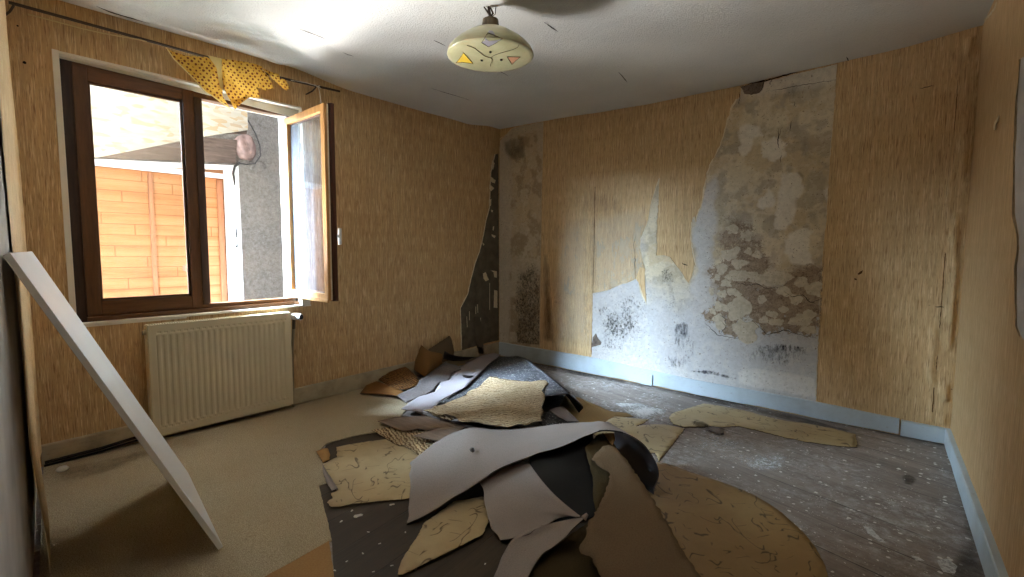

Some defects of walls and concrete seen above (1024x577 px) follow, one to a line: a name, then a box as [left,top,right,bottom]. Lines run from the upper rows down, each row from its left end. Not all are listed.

flaking render [591,64,837,401]